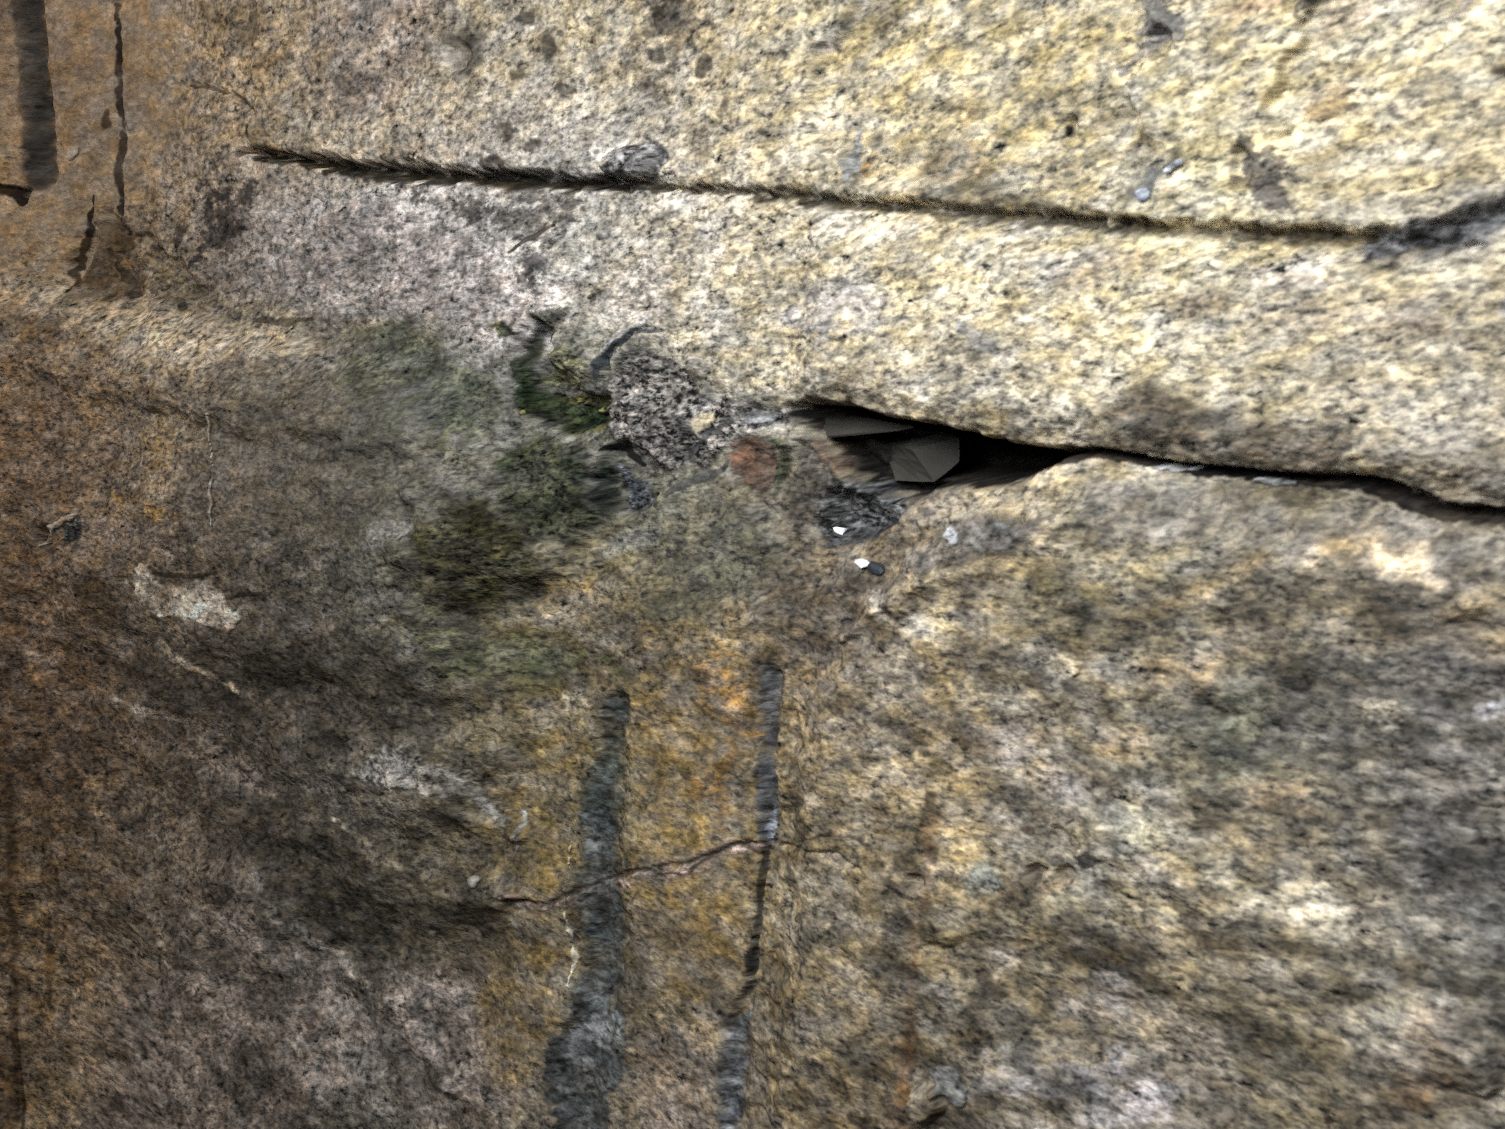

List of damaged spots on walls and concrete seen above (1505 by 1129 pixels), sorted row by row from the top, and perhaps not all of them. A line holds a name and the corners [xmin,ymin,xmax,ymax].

crack [101,2,127,217]
crack [507,224,555,253]
crack [1051,448,1505,528]
leakage [109,613,420,773]
leakage [97,946,321,1129]
leakage [240,801,502,1091]
leakage [350,745,529,851]
leakage [400,499,629,1129]
crack [496,832,872,910]
leakage [717,661,784,1129]